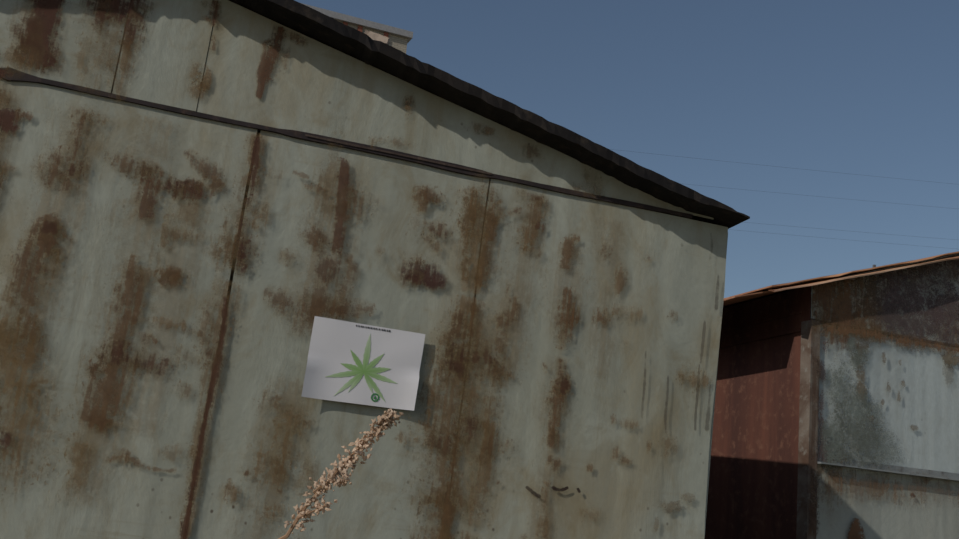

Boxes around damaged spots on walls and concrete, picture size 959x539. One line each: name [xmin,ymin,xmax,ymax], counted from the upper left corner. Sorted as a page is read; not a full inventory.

rust [13,0,64,74]
rust [86,0,148,51]
rust [256,26,305,98]
rust [8,214,68,362]
rust [81,255,184,433]
rust [109,133,265,539]
rust [263,157,375,323]
rust [401,259,447,289]
rust [396,288,520,539]
rust [424,187,547,287]
rust [547,287,580,469]
rust [809,356,822,536]